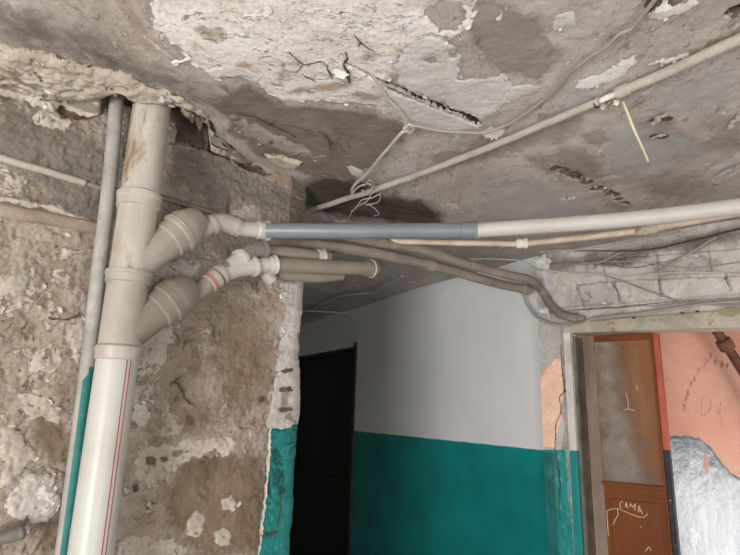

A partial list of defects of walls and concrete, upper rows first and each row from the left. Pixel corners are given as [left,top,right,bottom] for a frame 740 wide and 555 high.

water stain [7,19,177,86]
flaking render [0,42,236,164]
water stain [294,84,347,92]
crack [289,36,481,125]
water stain [471,3,560,106]
flaking render [0,190,89,220]
water stain [206,86,440,223]
spalling [550,166,631,204]
flaking render [0,422,62,523]
flaking render [17,393,66,424]
peeling [537,300,565,555]
crack [554,345,566,520]